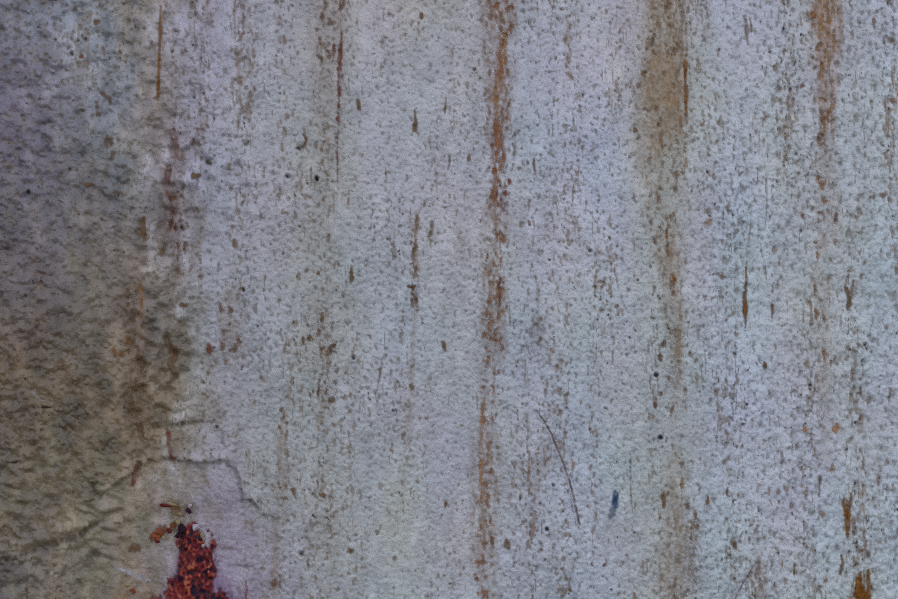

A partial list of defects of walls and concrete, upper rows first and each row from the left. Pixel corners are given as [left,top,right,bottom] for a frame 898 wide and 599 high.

corrosion [487,0,515,229]
corrosion [644,1,688,159]
corrosion [807,0,842,76]
corrosion [150,495,246,599]
corrosion [479,403,510,573]
corrosion [854,569,873,599]